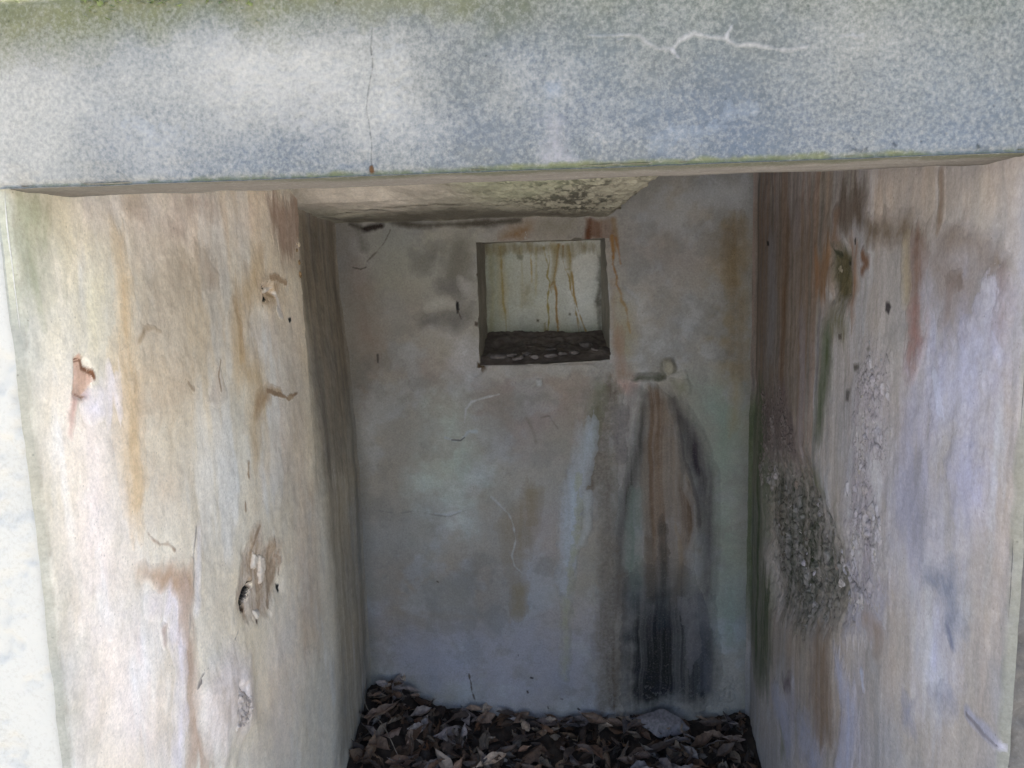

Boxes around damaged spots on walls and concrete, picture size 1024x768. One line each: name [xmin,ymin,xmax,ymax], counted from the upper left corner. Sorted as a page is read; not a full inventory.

crack [365,28,375,173]
crack [587,25,809,59]
rust [494,216,643,395]
spalling [66,351,96,442]
spalling [758,237,900,663]
spalling [235,500,283,628]
leakage [470,363,741,718]